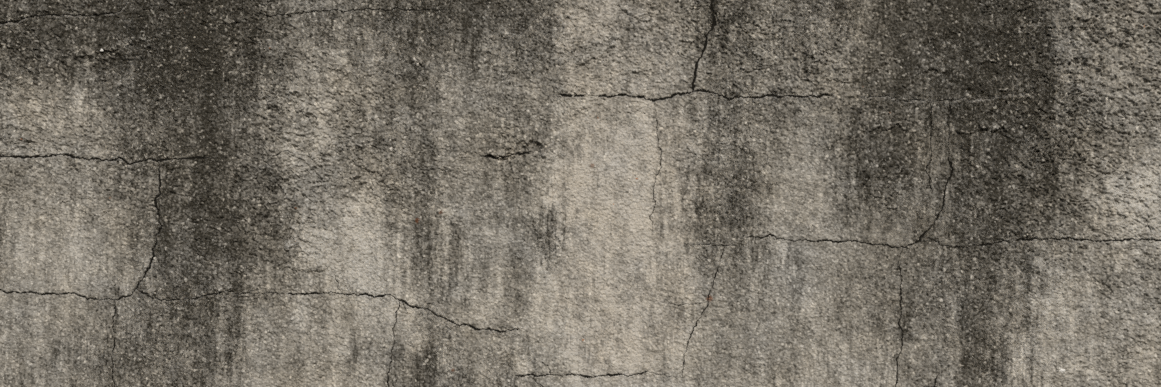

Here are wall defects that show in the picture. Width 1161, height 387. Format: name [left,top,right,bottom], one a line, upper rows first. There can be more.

crack [0,153,518,387]
leakage [0,0,558,387]
crack [483,151,531,159]
leakage [532,208,565,260]
crack [558,0,833,230]
crack [515,93,1161,387]
leakage [683,0,1109,387]